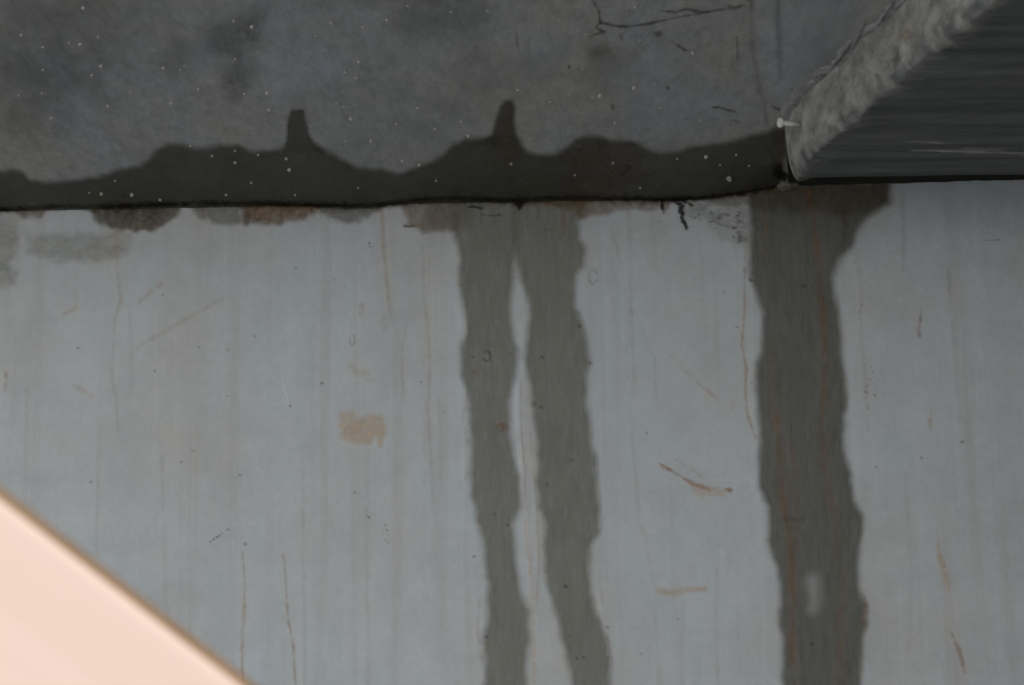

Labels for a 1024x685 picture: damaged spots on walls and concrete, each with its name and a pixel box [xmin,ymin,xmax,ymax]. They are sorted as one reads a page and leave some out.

water stain [0,101,889,685]